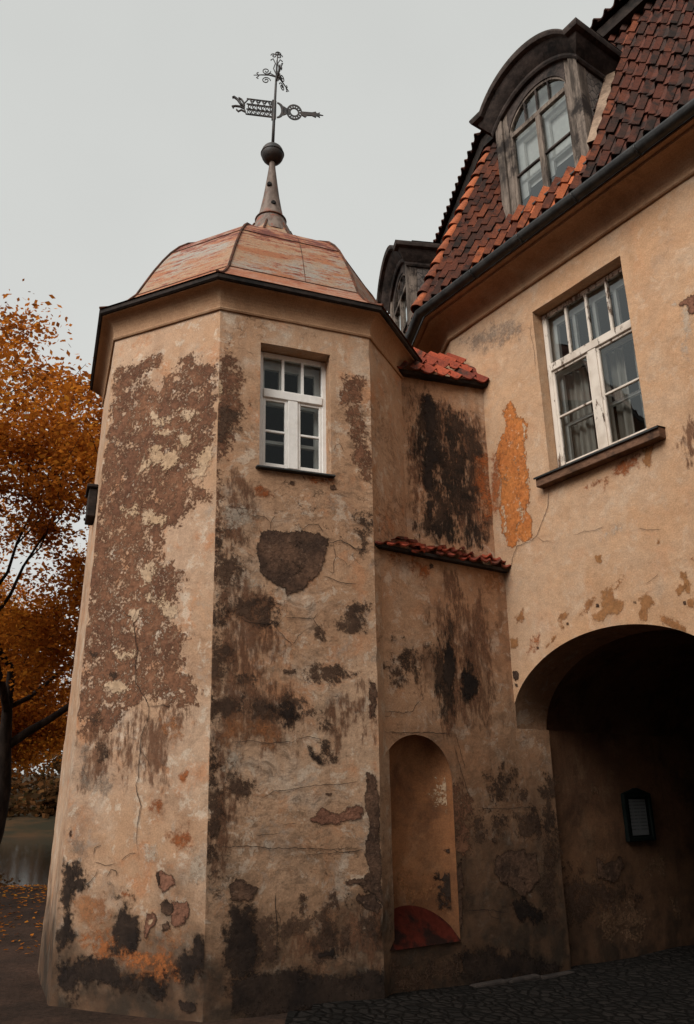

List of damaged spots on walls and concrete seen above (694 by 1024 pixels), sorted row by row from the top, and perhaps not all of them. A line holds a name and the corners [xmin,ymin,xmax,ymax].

flaking render [76,342,252,739]
flaking render [256,530,329,596]
flaking render [339,374,372,482]
leakage [403,387,493,550]
flaking render [471,401,533,548]
leakage [383,570,502,736]
crack [82,601,169,889]
leakage [55,844,204,1013]
flaking render [144,870,190,938]
flaking render [310,772,383,949]